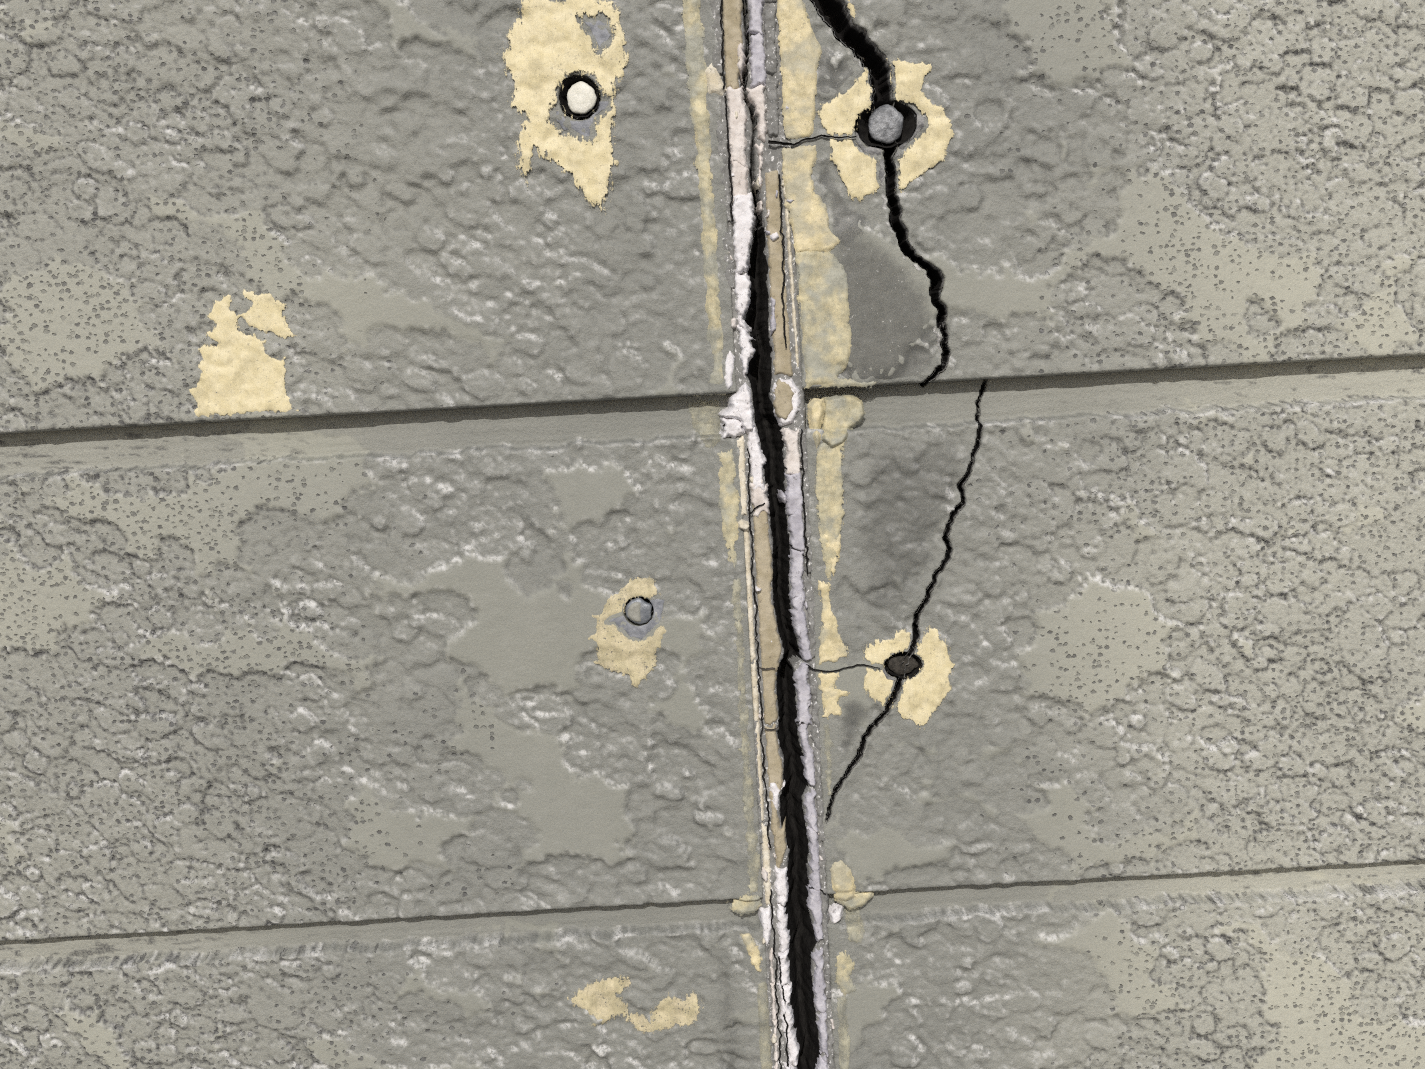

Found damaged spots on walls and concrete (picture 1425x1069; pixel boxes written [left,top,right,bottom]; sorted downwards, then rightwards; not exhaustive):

water stain [818,49,853,96]
spalling [556,101,608,136]
spalling [856,113,925,182]
water stain [821,170,928,380]
peeling [718,0,844,1069]
crack [720,0,987,1069]
spalling [610,599,665,640]